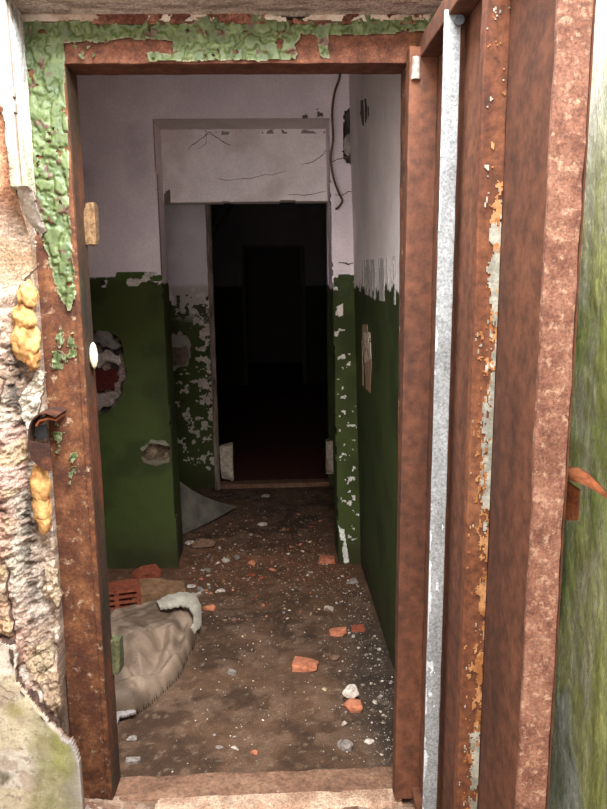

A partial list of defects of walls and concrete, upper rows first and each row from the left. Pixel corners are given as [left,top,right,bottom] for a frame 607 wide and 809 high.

corrosion [489,180,503,231]
spalling [0,13,434,724]
corrosion [475,308,498,406]
crack [0,568,60,729]
corrosion [425,661,438,715]
corrosion [427,561,439,638]
corrosion [464,420,491,770]
water stain [559,696,580,809]